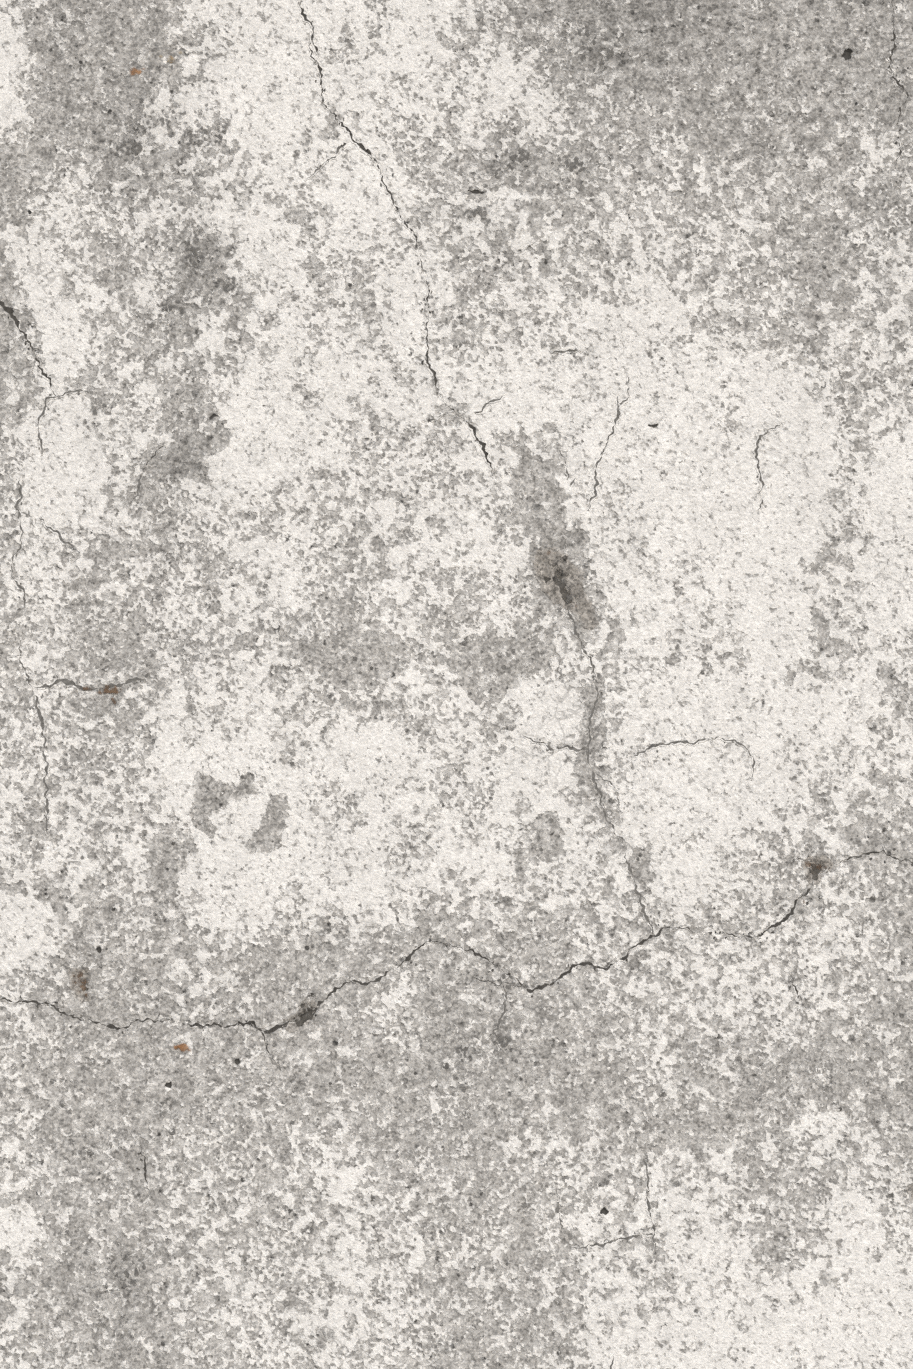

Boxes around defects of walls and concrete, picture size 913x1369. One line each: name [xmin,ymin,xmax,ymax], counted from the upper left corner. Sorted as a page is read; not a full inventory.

crack [0,299,148,837]
crack [296,0,505,476]
crack [551,347,594,356]
crack [558,372,631,511]
crack [0,609,913,1055]
crack [607,1354,615,1369]